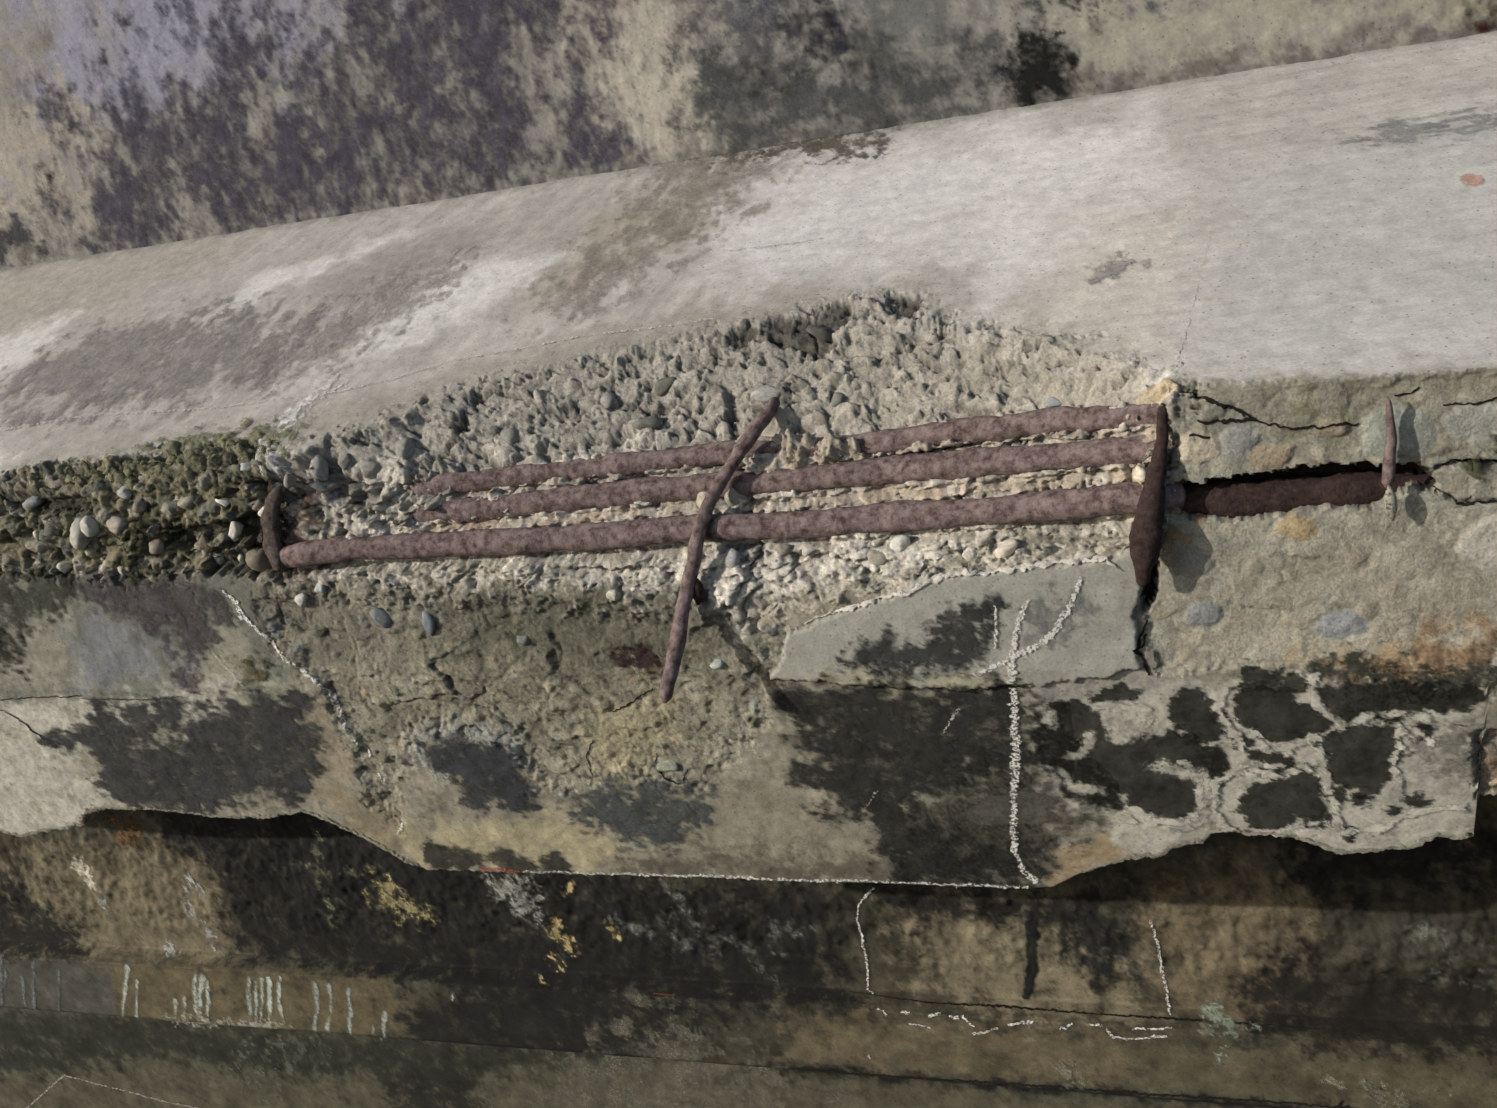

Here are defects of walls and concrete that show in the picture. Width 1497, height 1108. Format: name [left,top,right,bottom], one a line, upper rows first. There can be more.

damp [26,0,1098,320]
damp [0,213,47,265]
crack [1394,387,1497,406]
crack [1433,459,1497,506]
corrosion [255,484,324,581]
corrosion [693,578,706,605]
spalling [0,277,1497,873]
damp [0,562,326,818]
corrosion [608,643,665,682]
damp [1301,645,1497,707]
damp [406,715,542,818]
damp [567,773,716,857]